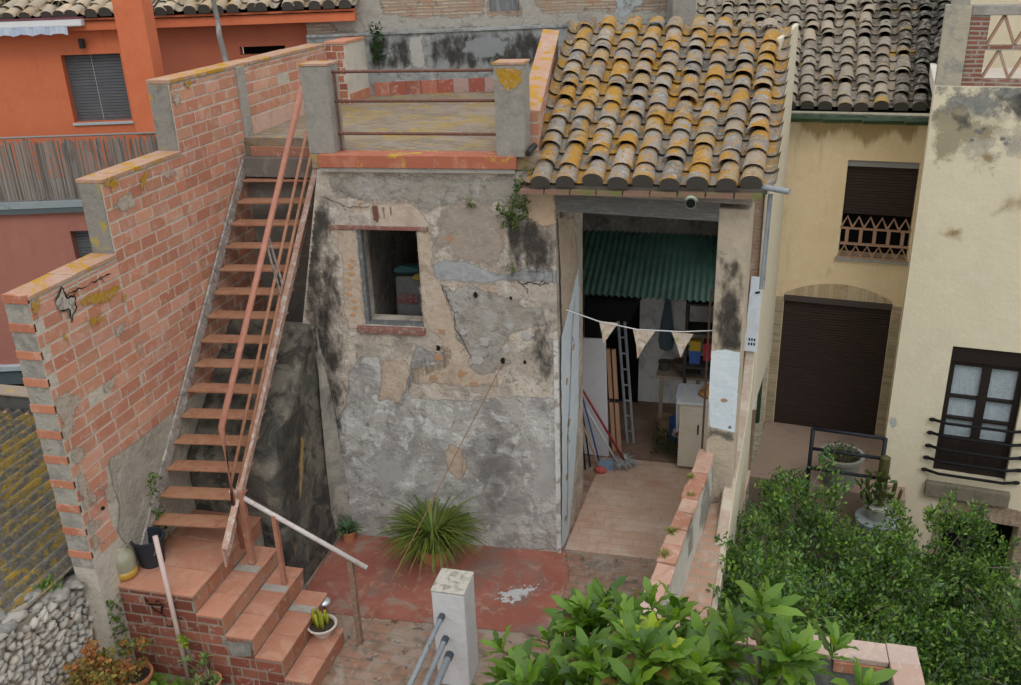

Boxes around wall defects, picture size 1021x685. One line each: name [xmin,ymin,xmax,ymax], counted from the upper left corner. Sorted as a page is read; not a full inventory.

leakage [369,32,539,68]
leakage [933,86,1021,160]
crack [56,274,110,322]
leakage [307,206,341,406]
spalling [330,173,556,402]
leakage [535,330,551,375]